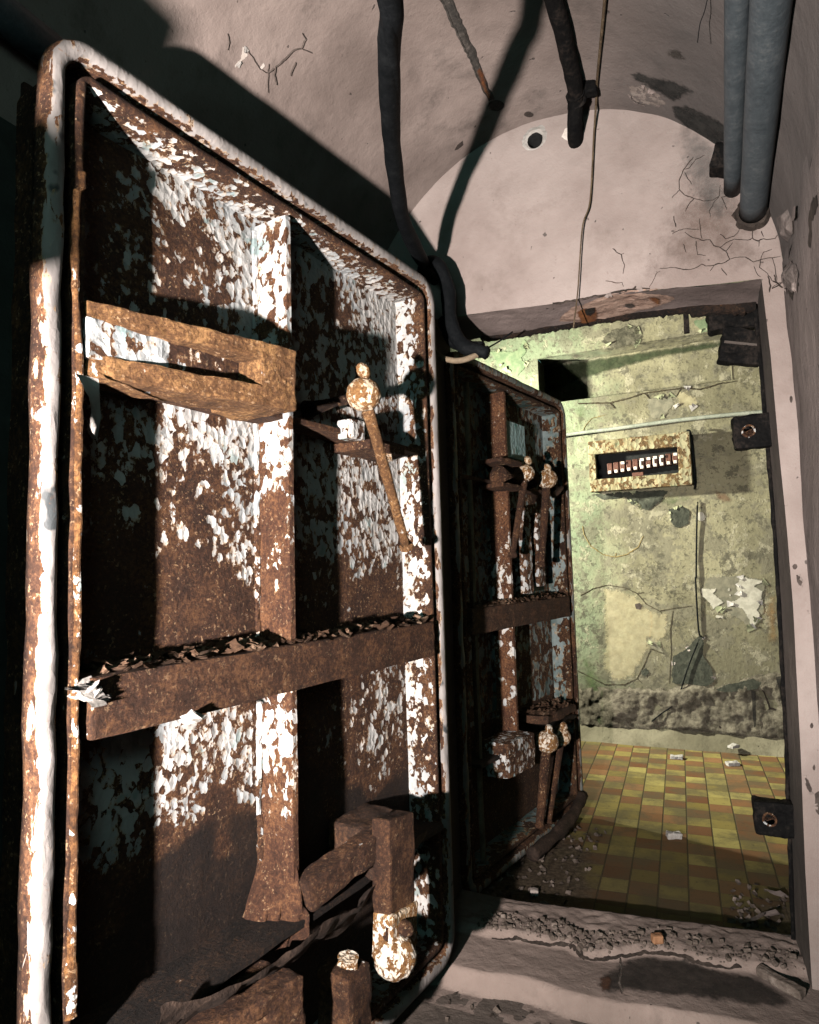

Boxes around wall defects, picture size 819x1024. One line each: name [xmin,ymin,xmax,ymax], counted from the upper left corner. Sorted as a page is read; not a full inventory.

crack [227,33,313,92]
water stain [633,73,692,101]
crack [553,155,818,305]
rust [466,592,566,610]
peeling [701,575,769,632]
rust [80,613,428,675]
flaking render [579,589,784,739]
water stain [601,958,786,1006]